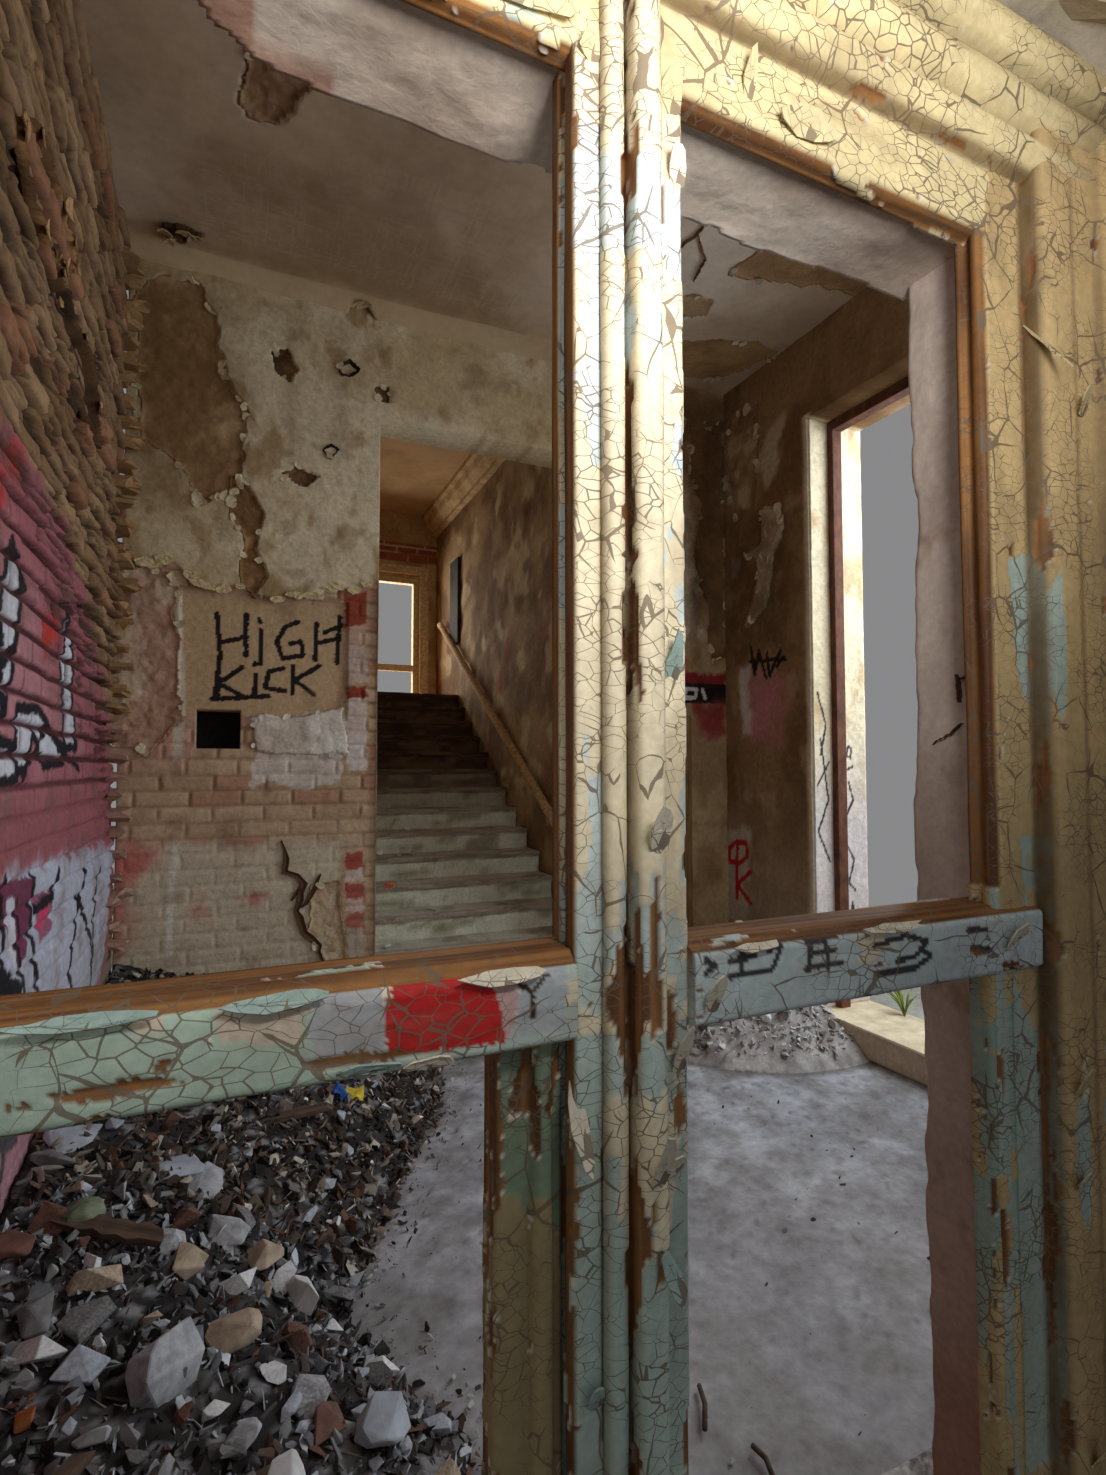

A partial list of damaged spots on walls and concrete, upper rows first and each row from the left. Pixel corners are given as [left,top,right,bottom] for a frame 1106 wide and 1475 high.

spalling [240,52,312,125]
crack [681,226,707,281]
peeling [728,250,866,297]
peeling [683,294,714,320]
peeling [682,339,777,383]
peeling [684,397,784,664]
spalling [104,249,371,960]
crack [281,840,324,961]
peeling [0,1010,159,1035]
peeling [218,989,329,1016]
peeling [568,1080,595,1180]
peeling [661,1250,688,1310]